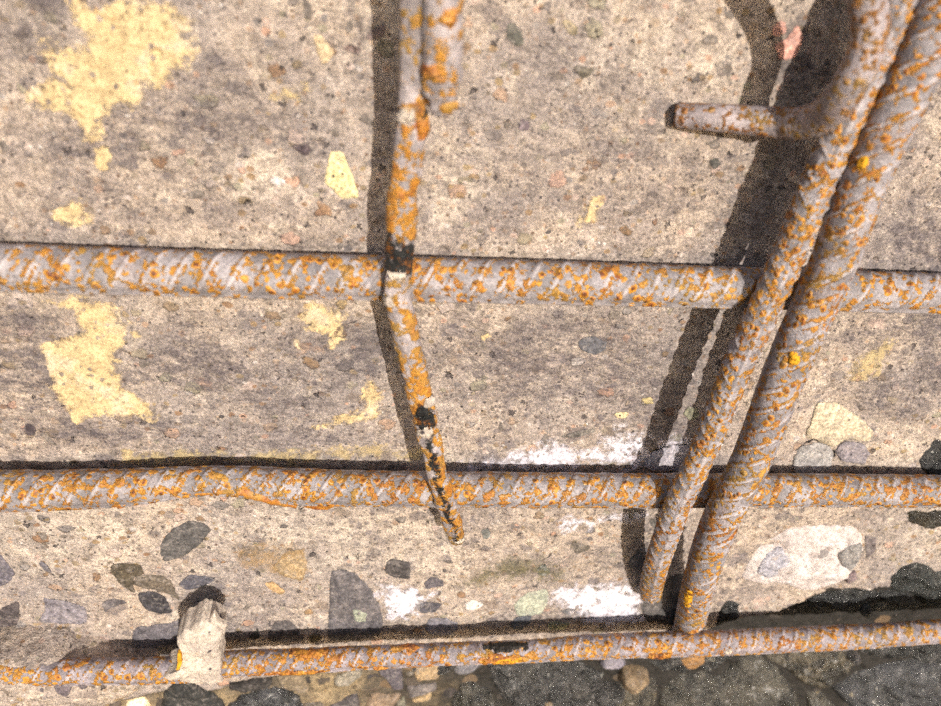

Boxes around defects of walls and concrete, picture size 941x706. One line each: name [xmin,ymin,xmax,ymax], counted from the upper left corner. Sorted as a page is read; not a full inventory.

rust [441,8,458,30]
peeling [26,0,200,171]
rust [402,102,430,140]
peeling [40,295,160,425]
spalling [919,439,941,475]
rust [195,489,335,510]
spalling [907,510,941,529]
spalling [707,524,941,630]
rust [264,648,328,676]
rust [391,643,423,652]
rust [478,654,529,665]
spalling [105,644,941,706]